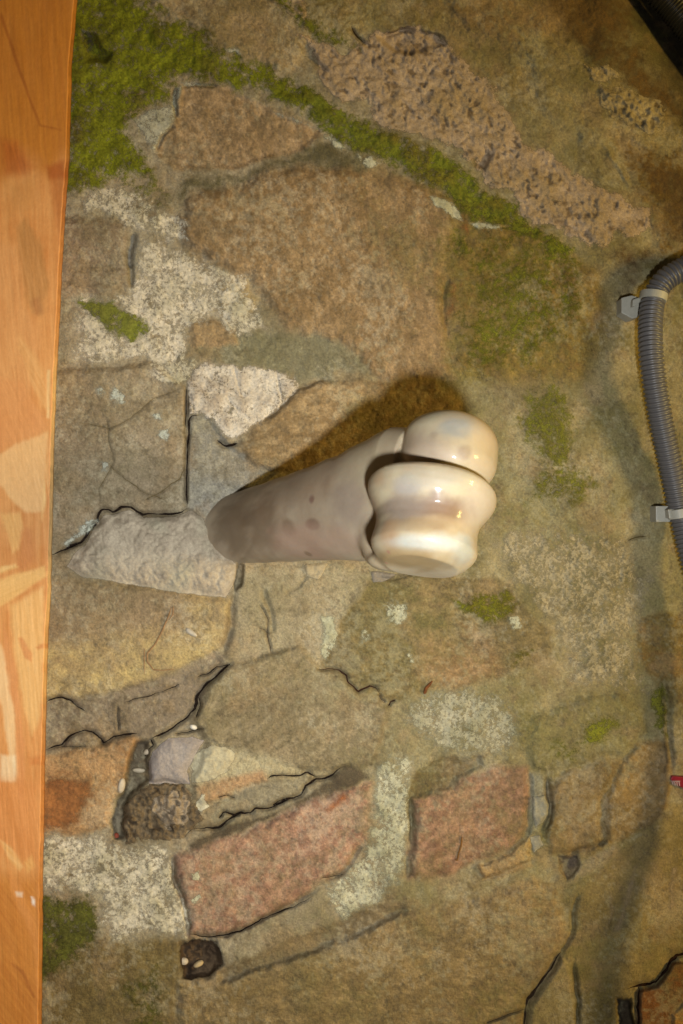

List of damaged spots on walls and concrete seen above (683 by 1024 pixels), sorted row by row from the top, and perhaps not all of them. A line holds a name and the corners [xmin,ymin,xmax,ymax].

crack [52,389,242,555]
crack [46,664,230,756]
crack [319,668,395,706]
crack [187,767,342,834]
crack [487,952,561,1024]
crack [628,953,683,1024]